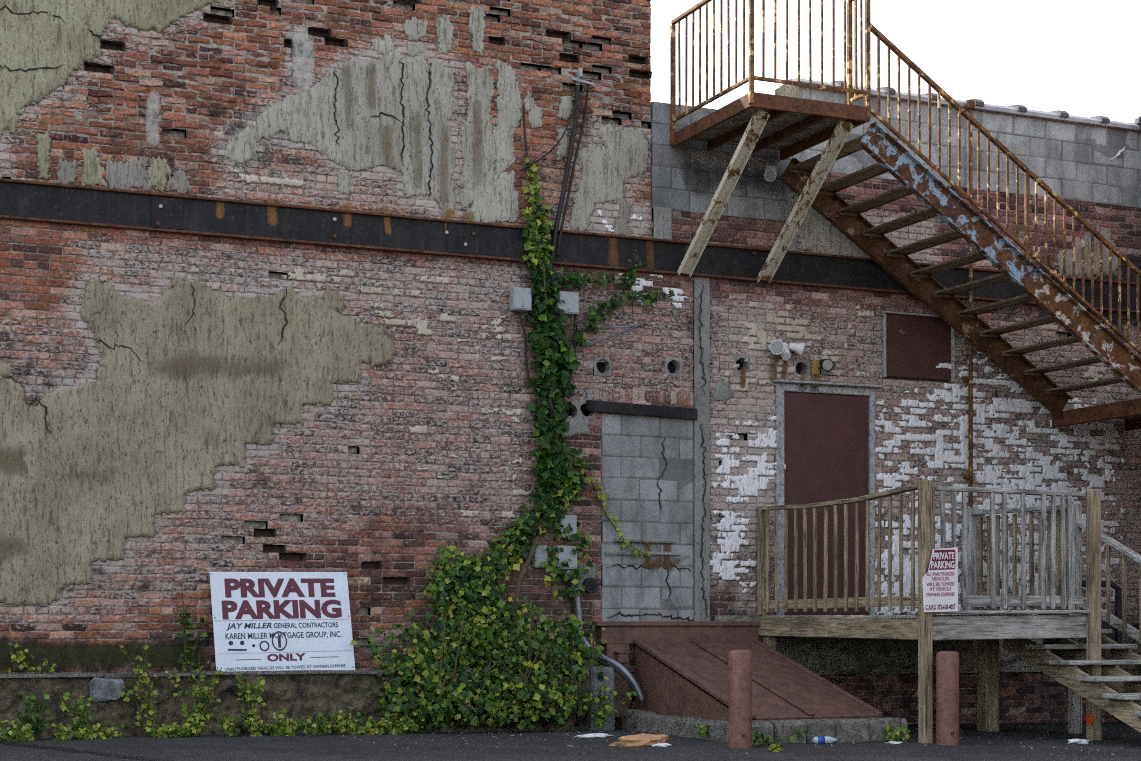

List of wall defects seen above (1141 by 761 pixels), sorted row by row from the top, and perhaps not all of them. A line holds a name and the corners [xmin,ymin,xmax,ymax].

crack [0,64,60,72]
crack [0,5,103,41]
peeling [35,129,192,195]
peeling [0,0,232,138]
corrosion [216,201,224,219]
corrosion [267,199,278,225]
peeling [224,0,652,236]
crack [698,283,706,395]
corrosion [769,354,788,383]
peeling [0,266,459,607]
crack [607,425,708,621]
peeling [875,343,1128,615]